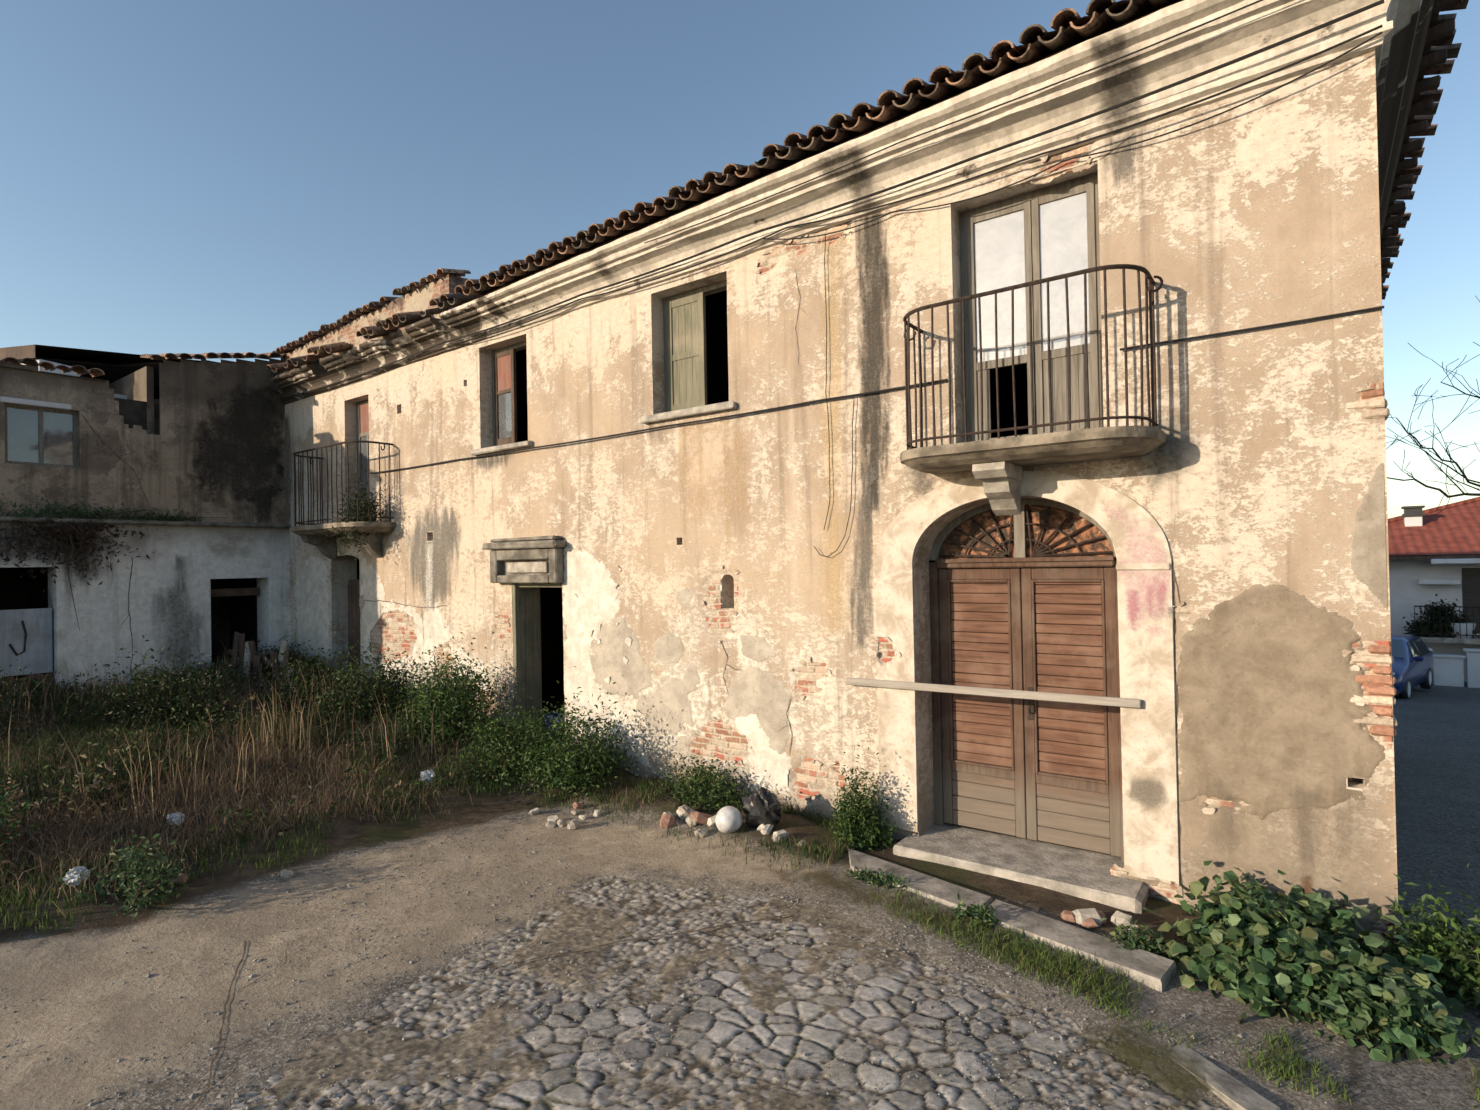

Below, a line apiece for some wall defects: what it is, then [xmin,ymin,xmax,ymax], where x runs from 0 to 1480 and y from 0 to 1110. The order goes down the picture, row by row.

water stain [821,149,890,644]
flaking render [1346,382,1390,421]
water stain [192,387,292,524]
water stain [409,508,458,609]
peeling [360,558,511,712]
peeling [562,546,650,767]
flaking render [700,565,740,644]
flaking render [790,657,832,700]
flaking render [1342,640,1397,747]
peeling [687,714,845,803]
flaking render [1200,799,1235,815]